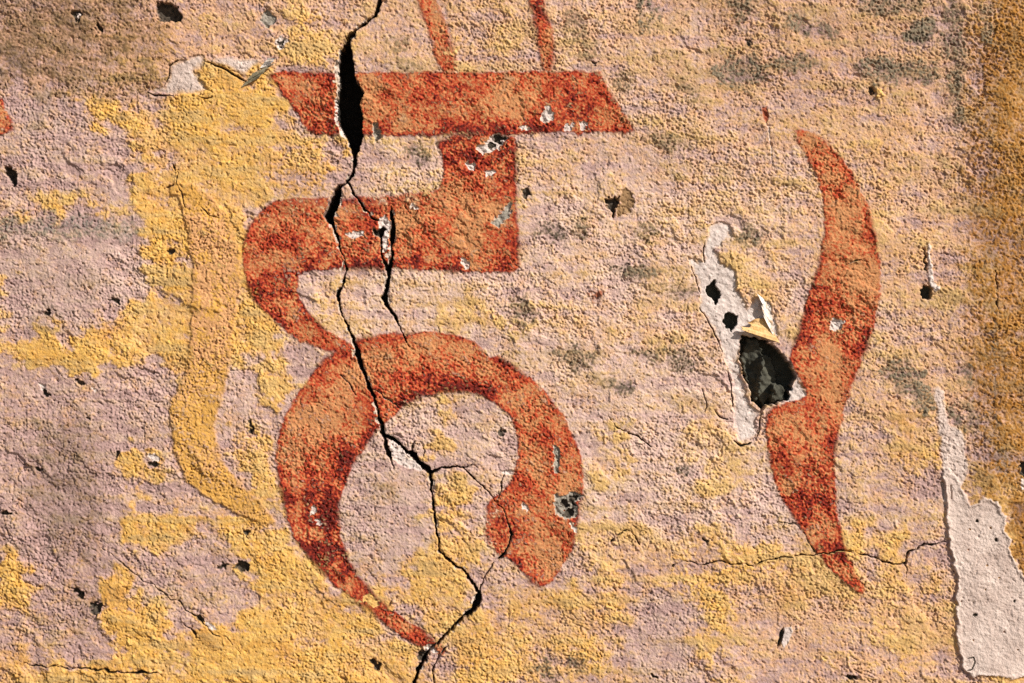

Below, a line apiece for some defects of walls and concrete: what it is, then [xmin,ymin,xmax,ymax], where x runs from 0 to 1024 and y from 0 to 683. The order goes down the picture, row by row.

peeling [147,9,289,99]
crack [323,0,514,683]
peeling [687,221,807,448]
spalling [553,491,584,533]
crack [671,521,944,574]